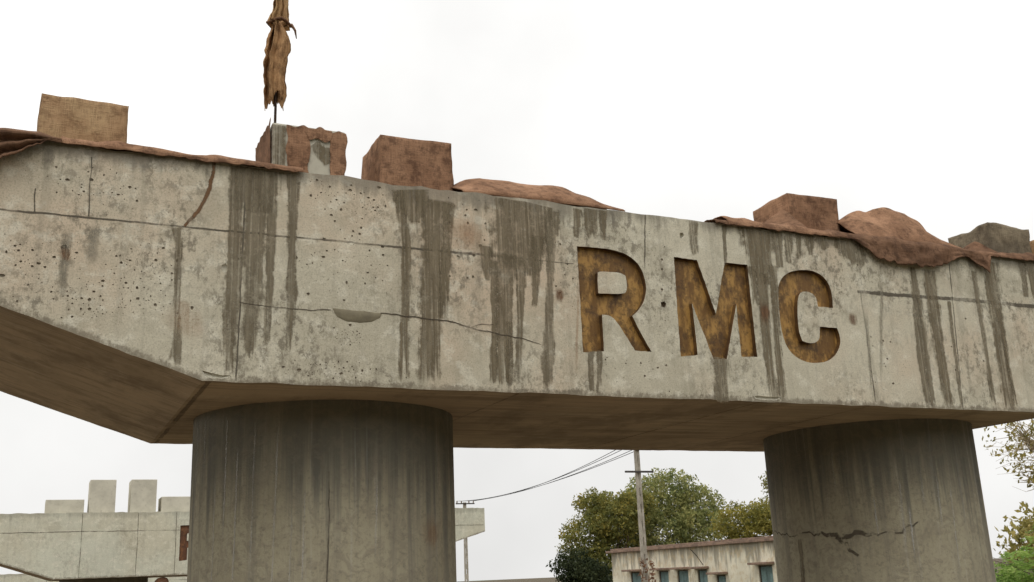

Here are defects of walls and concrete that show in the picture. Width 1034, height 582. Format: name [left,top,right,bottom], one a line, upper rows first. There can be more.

crack [184,162,216,227]
leakage [222,125,300,371]
crack [240,302,330,311]
leakage [393,190,455,379]
crack [382,313,541,345]
leakage [481,198,560,386]
leakage [573,208,607,240]
leakage [910,267,962,406]
leakage [971,262,1017,406]
leakage [1020,262,1034,297]
crack [772,521,918,557]